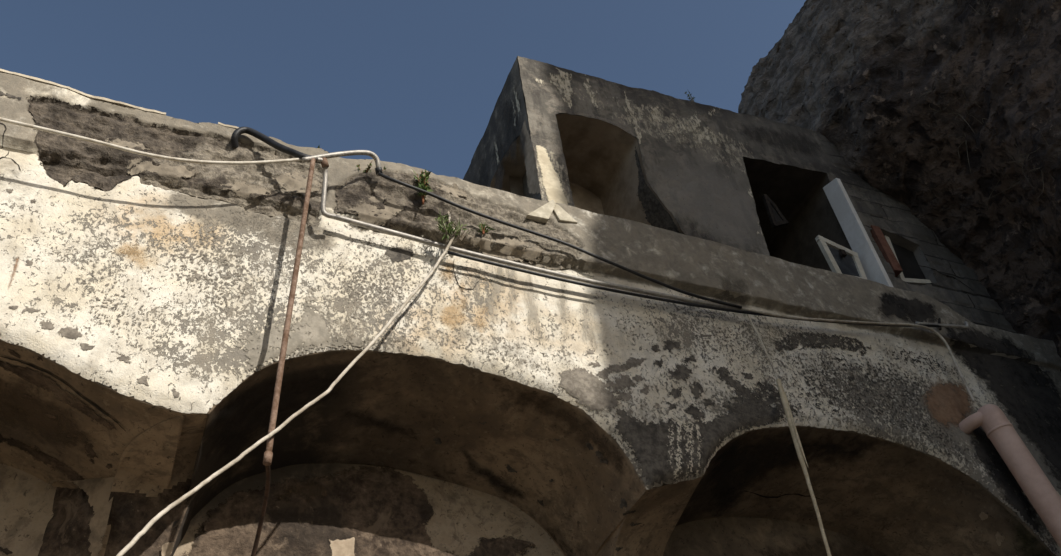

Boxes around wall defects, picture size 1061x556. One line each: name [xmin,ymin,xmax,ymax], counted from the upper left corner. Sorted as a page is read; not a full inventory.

spalling [0,91,584,270]
spalling [635,146,681,234]
crack [0,356,123,429]
flaking render [0,216,979,486]
rust [926,381,971,426]
water stain [666,414,864,512]
flaking render [183,464,535,556]